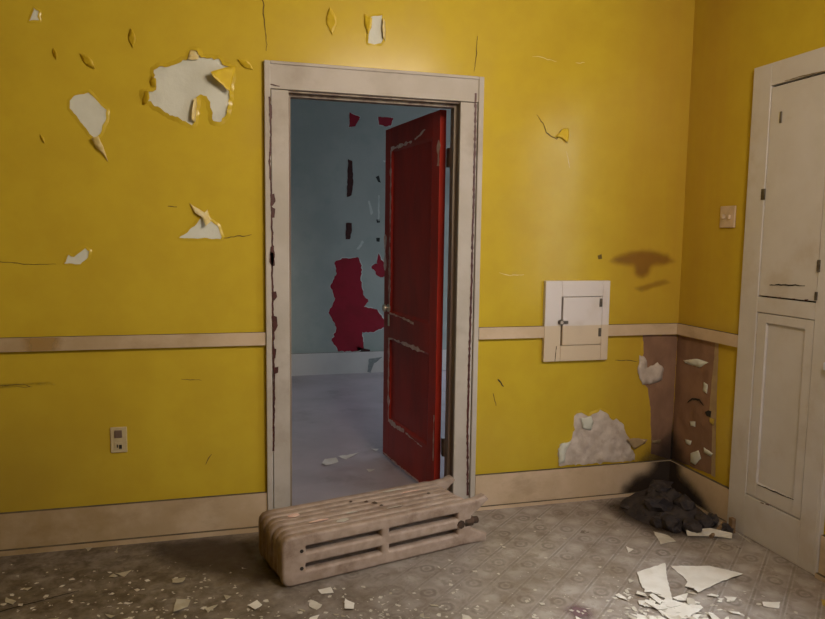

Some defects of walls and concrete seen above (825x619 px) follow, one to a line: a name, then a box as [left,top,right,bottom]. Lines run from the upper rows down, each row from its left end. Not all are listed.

peeling [364,13,386,46]
peeling [139,46,236,129]
peeling [67,89,110,161]
crack [537,115,570,167]
peeling [177,204,252,242]
peeling [62,246,92,266]
flaking render [555,334,719,477]